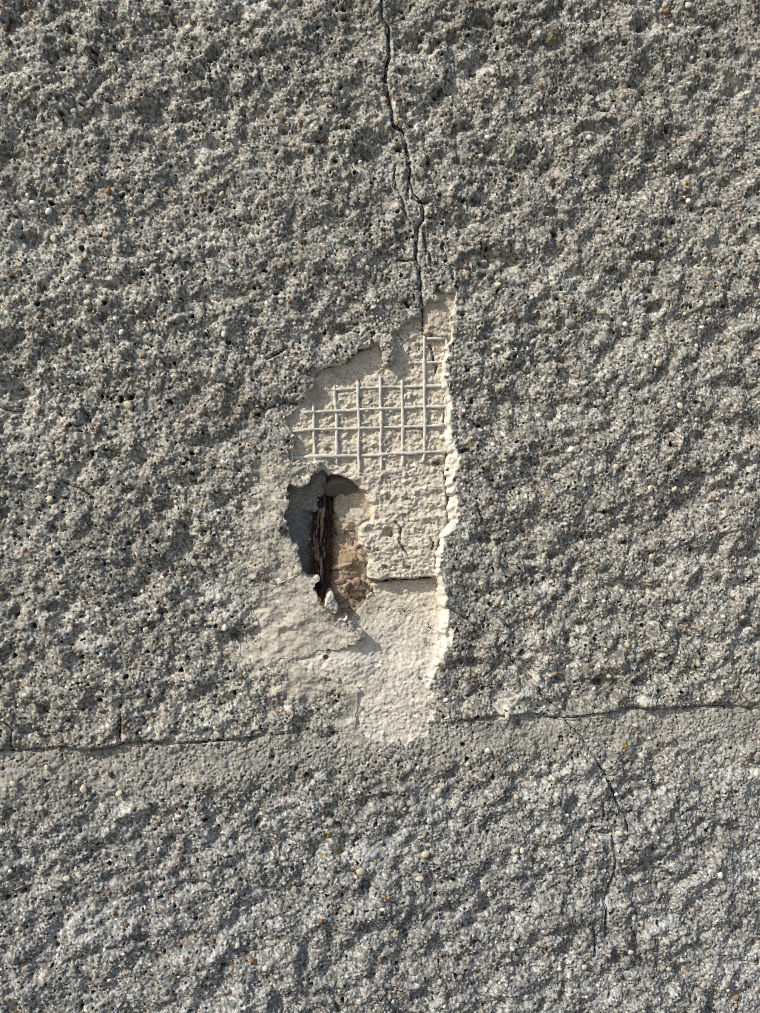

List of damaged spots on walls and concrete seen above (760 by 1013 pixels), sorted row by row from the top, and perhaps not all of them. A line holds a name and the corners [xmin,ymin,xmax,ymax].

crack [380,0,454,372]
crack [0,723,61,751]
crack [87,702,299,750]
rust [307,494,374,618]
flaking render [222,288,461,747]
crack [450,608,646,953]